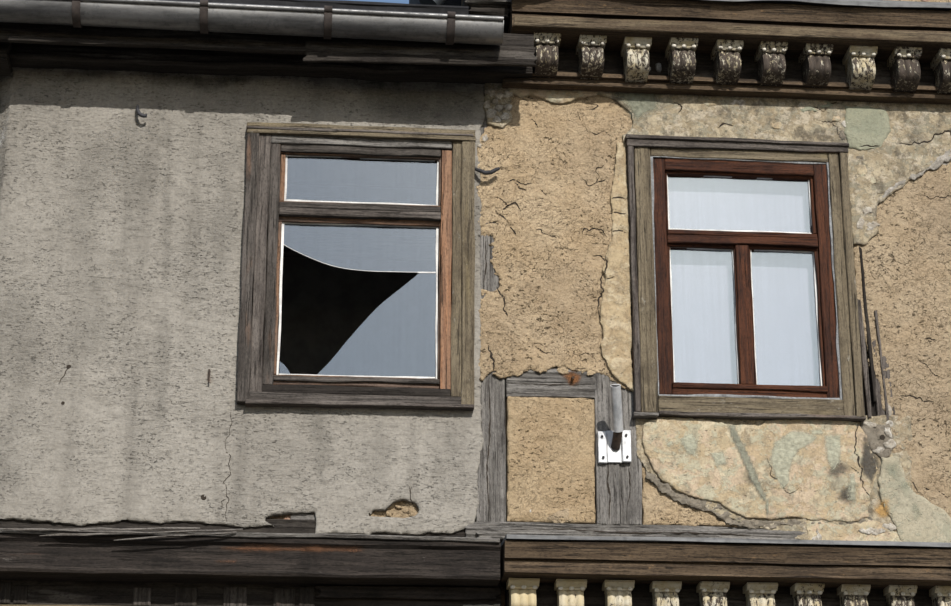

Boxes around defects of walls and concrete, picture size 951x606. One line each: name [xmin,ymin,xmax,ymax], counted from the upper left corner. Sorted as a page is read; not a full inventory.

crack [860,129,951,147]
crack [484,179,557,317]
crack [582,165,626,321]
spalling [476,83,951,543]
crack [221,412,232,518]
spalling [369,501,418,518]